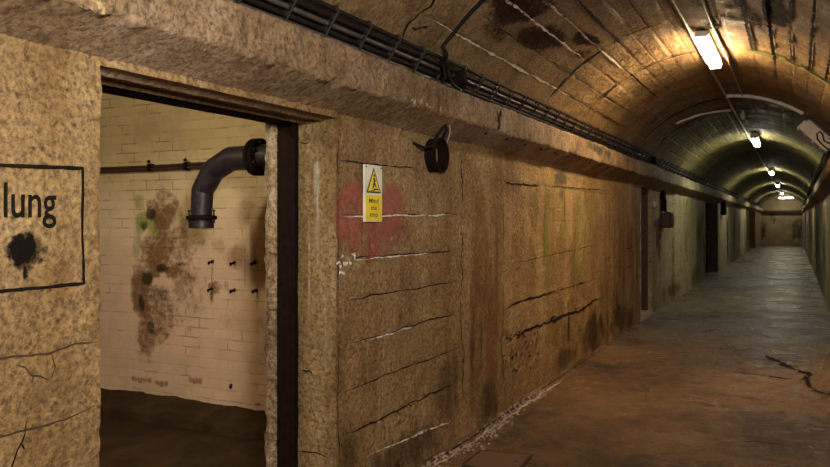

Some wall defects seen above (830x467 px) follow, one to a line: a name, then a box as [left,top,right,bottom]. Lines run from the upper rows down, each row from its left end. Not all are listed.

crack [502,171,610,236]
leakage [131,191,193,354]
crack [502,243,633,366]
crack [0,342,93,381]
crack [738,355,830,395]
crack [0,403,100,467]